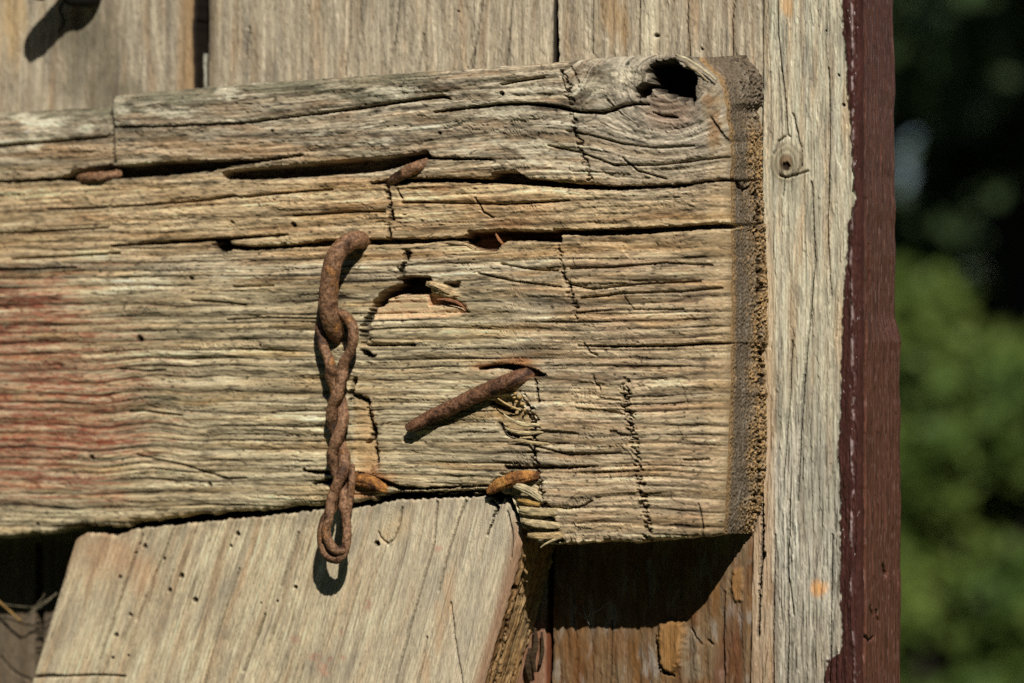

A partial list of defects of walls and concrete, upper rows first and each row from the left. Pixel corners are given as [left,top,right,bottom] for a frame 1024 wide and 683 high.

crack [0,0,764,683]
corrosion [462,354,549,397]
corrosion [364,461,399,483]
corrosion [354,487,382,501]